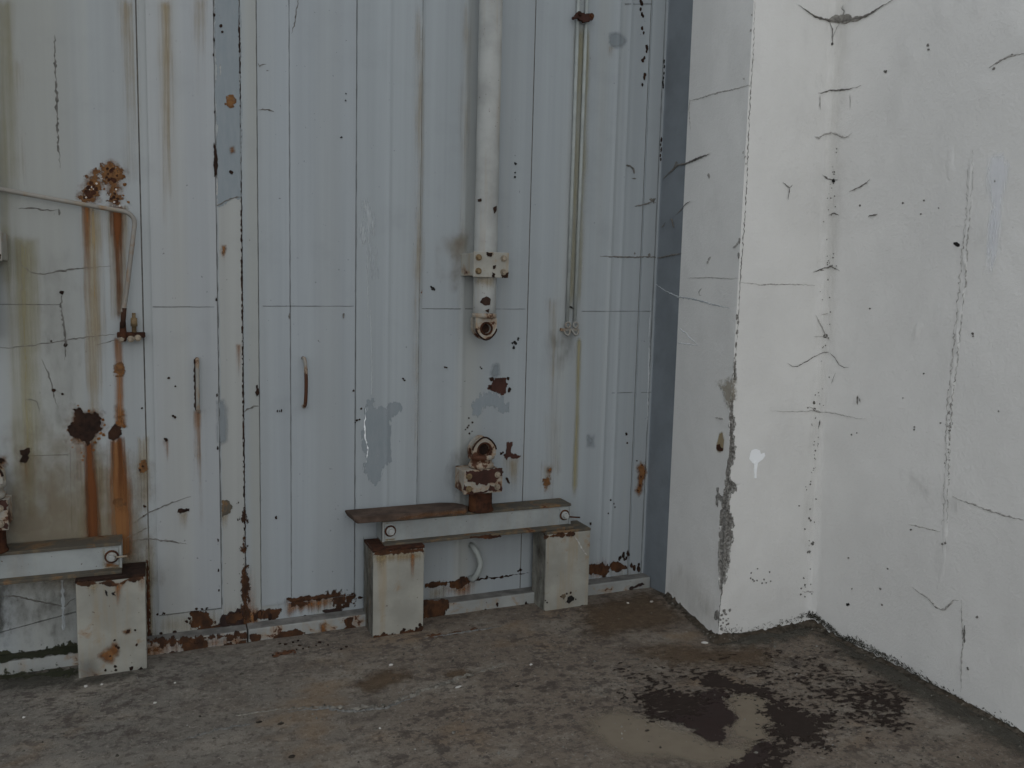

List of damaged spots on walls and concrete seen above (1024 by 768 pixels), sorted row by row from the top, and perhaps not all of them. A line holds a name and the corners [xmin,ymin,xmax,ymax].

corrosion [214,21,241,114]
corrosion [76,143,363,672]
peeling [355,310,402,486]
peeling [465,365,511,435]
corrosion [463,468,503,495]
spalling [714,358,737,630]
crack [952,496,1023,520]
crack [915,589,965,690]
leakage [589,645,916,768]